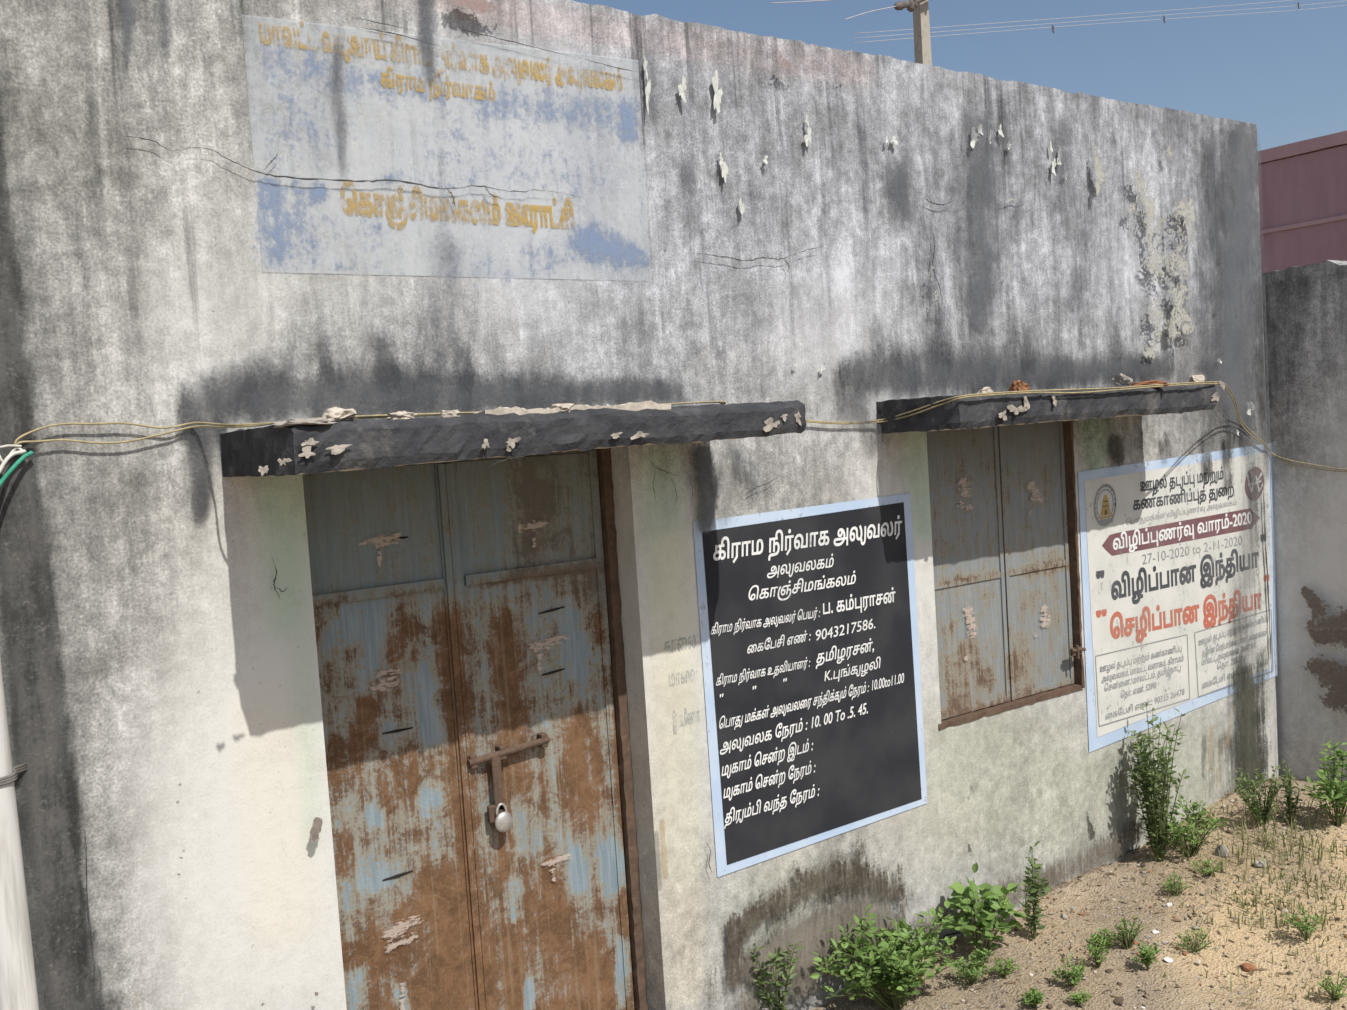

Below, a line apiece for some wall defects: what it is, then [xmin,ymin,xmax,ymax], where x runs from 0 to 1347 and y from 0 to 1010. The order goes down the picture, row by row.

crack [126,136,576,209]
damp [886,161,915,216]
damp [967,111,1000,327]
peeling [1126,165,1200,359]
damp [839,231,1175,446]
spalling [258,438,352,475]
spalling [610,431,649,440]
spalling [763,411,802,432]
damp [1199,124,1275,797]
damp [0,119,120,1010]
flaking render [1300,585,1347,714]
flaking render [310,817,323,843]